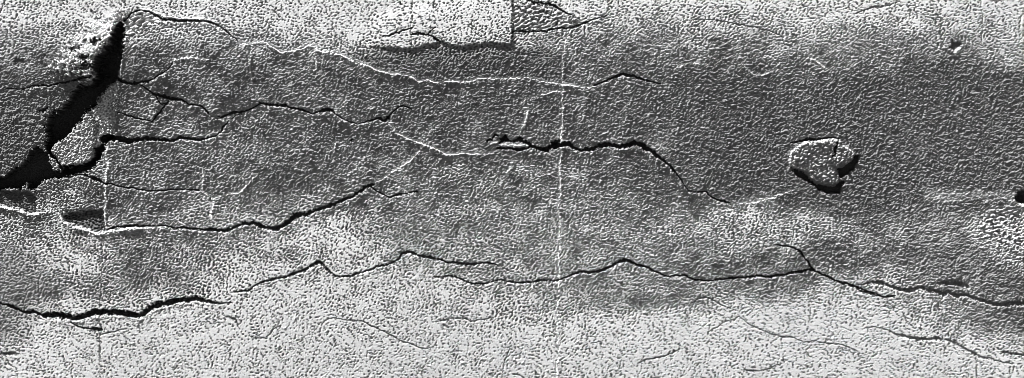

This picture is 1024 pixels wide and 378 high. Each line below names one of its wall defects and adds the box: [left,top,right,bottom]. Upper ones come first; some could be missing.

crack [513,0,607,34]
crack [5,75,92,90]
crack [66,8,1024,308]
crack [0,250,499,335]